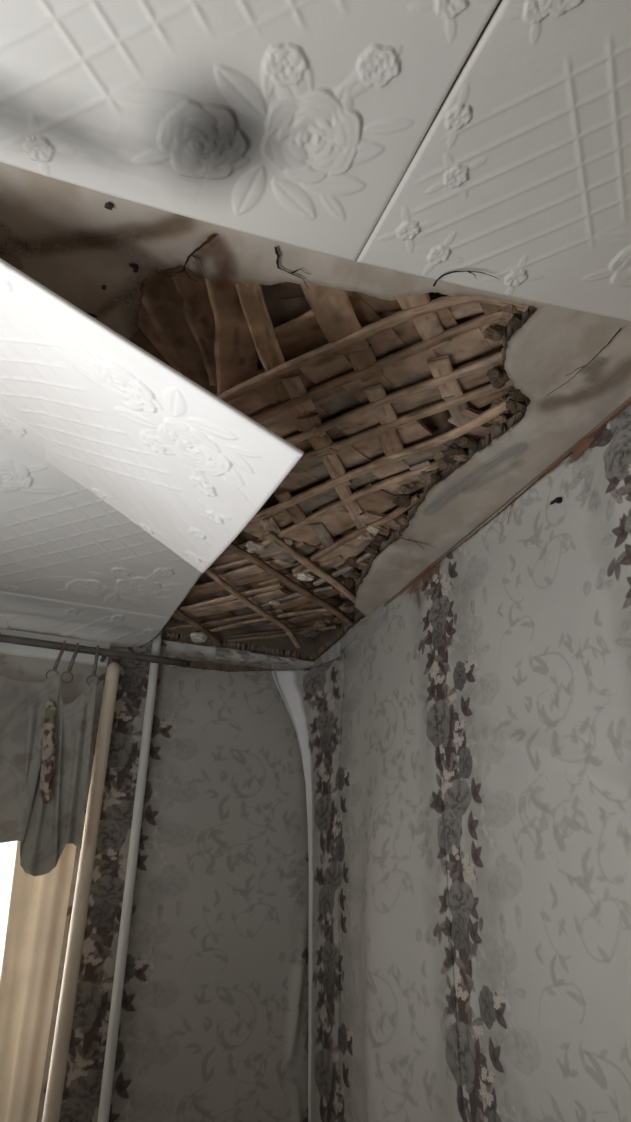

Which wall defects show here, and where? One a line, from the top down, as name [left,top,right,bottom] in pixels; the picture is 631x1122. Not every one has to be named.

leakage [0,219,186,253]
crack [274,247,309,288]
crack [433,270,498,287]
peeling [321,642,341,664]